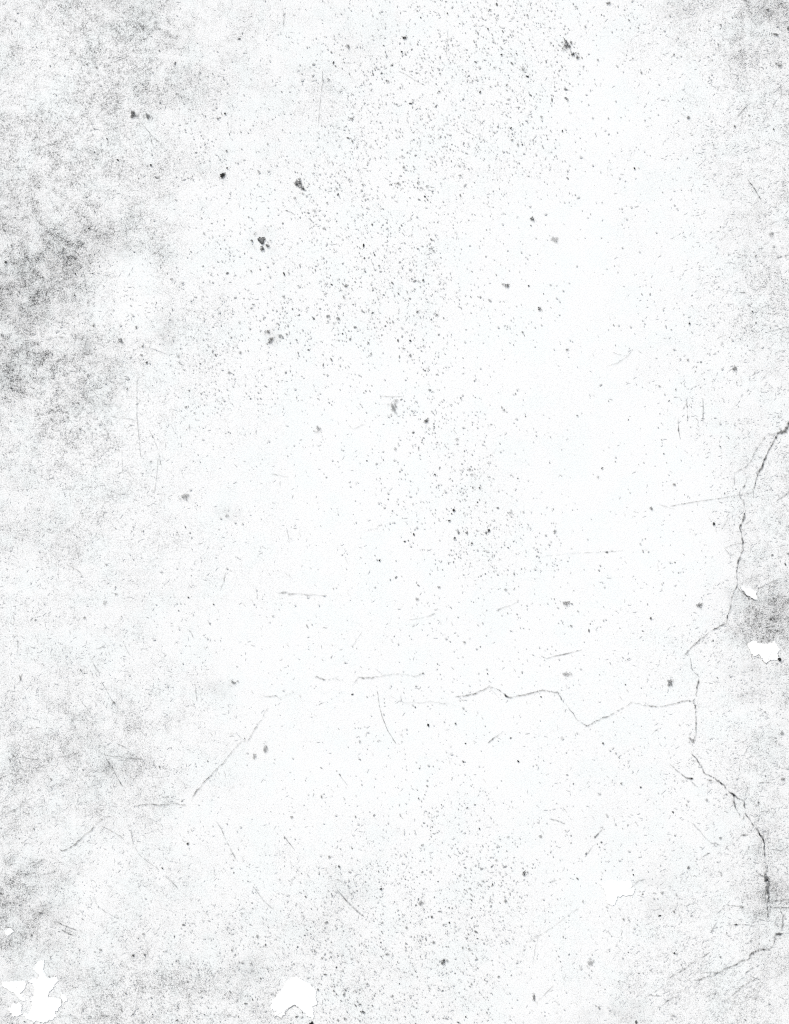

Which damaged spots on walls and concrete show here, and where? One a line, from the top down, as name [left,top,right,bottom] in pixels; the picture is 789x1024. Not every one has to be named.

crack [743,422,789,487]
peeling [741,585,758,600]
peeling [747,641,781,664]
crack [687,756,789,987]
peeling [2,960,67,1023]
peeling [271,975,319,1024]